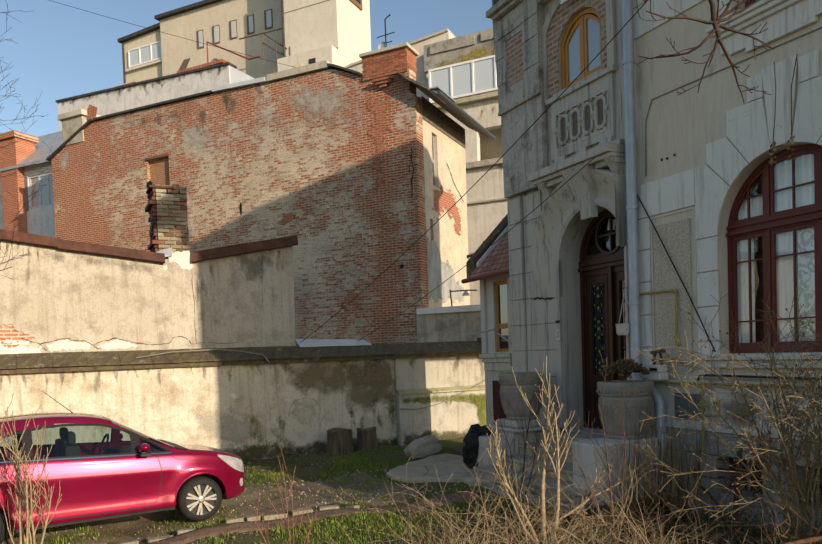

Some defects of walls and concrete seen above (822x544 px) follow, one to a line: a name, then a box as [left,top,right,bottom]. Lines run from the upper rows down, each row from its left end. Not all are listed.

crack [407,147,415,197]
flaking render [432,185,462,236]
flaking render [163,251,193,271]
flaking render [0,324,138,354]
leakage [285,360,486,426]